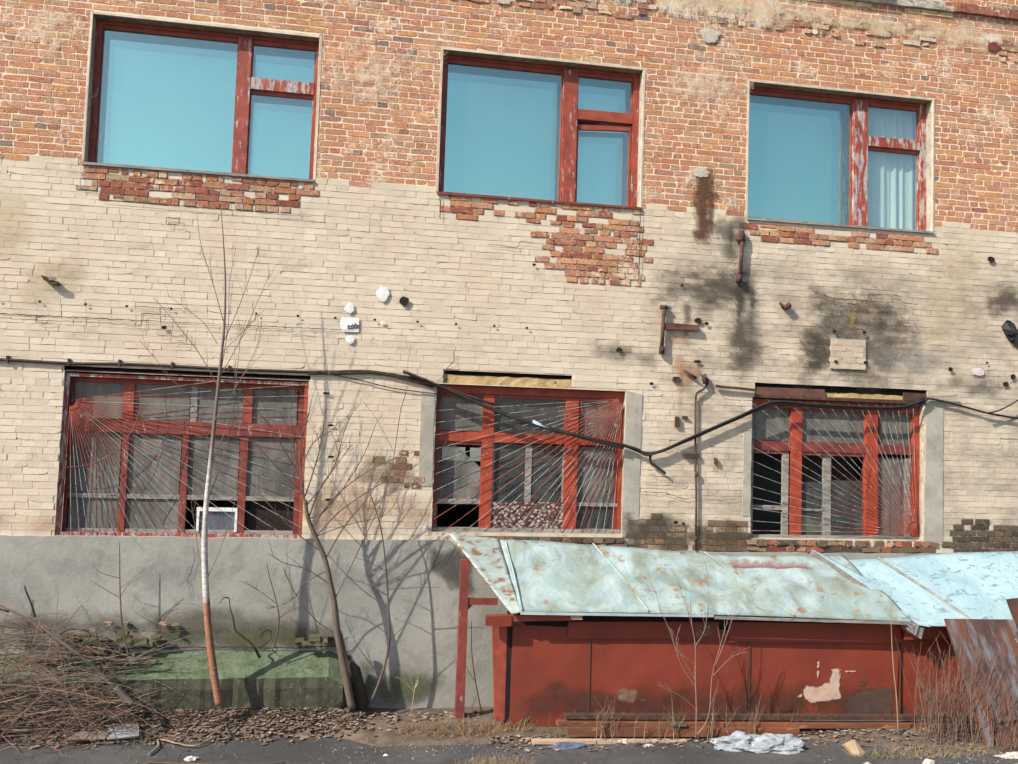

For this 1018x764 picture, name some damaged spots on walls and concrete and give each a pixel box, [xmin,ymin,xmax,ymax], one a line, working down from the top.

peeling [76,166,319,214]
peeling [439,195,654,287]
damp [717,219,744,257]
damp [736,287,755,323]
peeling [373,450,424,488]
spalling [478,513,1018,554]
damp [150,611,231,634]
peeling [798,661,856,703]